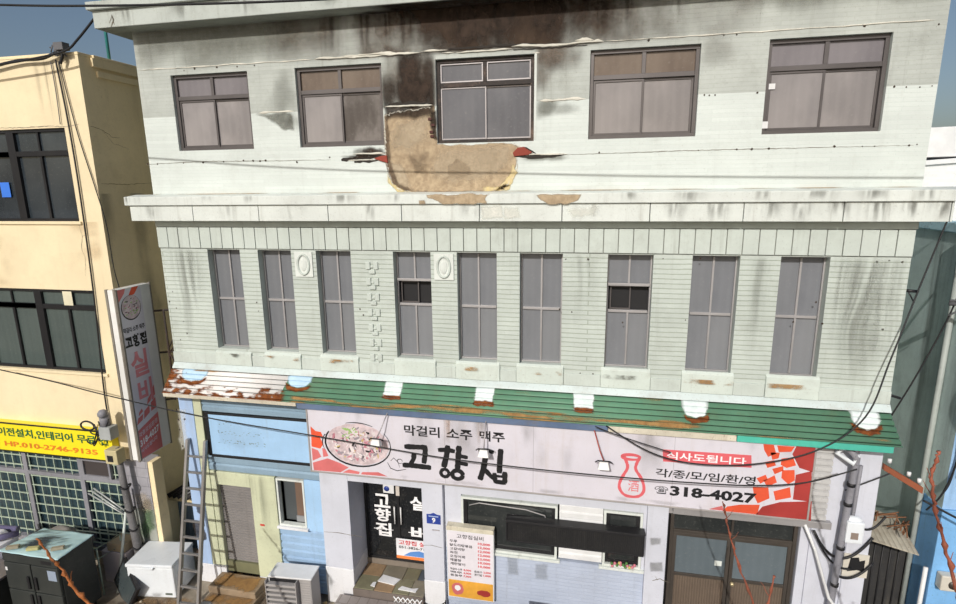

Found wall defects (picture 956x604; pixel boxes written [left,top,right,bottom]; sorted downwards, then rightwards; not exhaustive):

spalling [384,103,521,219]
spalling [537,194,580,204]
corrosion [162,369,699,429]